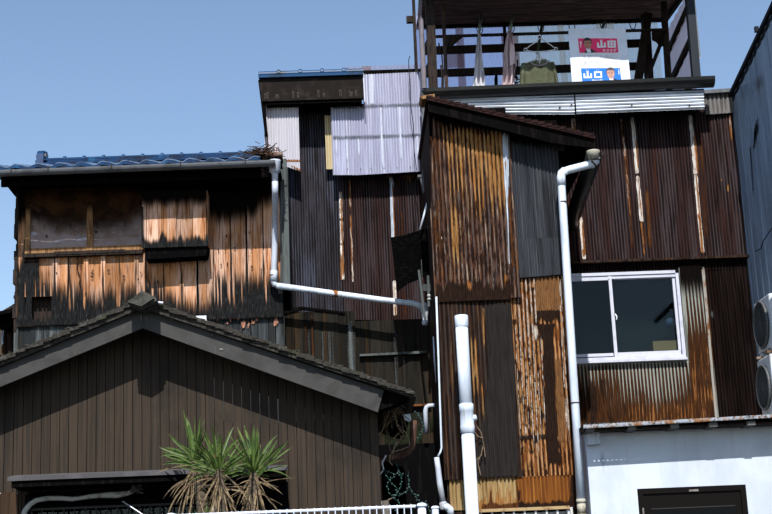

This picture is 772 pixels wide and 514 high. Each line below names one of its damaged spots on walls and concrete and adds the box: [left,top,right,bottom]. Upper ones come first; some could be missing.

rust [430,126,509,267]
rust [514,339,546,462]
rust [532,275,560,320]
rust [577,265,717,426]